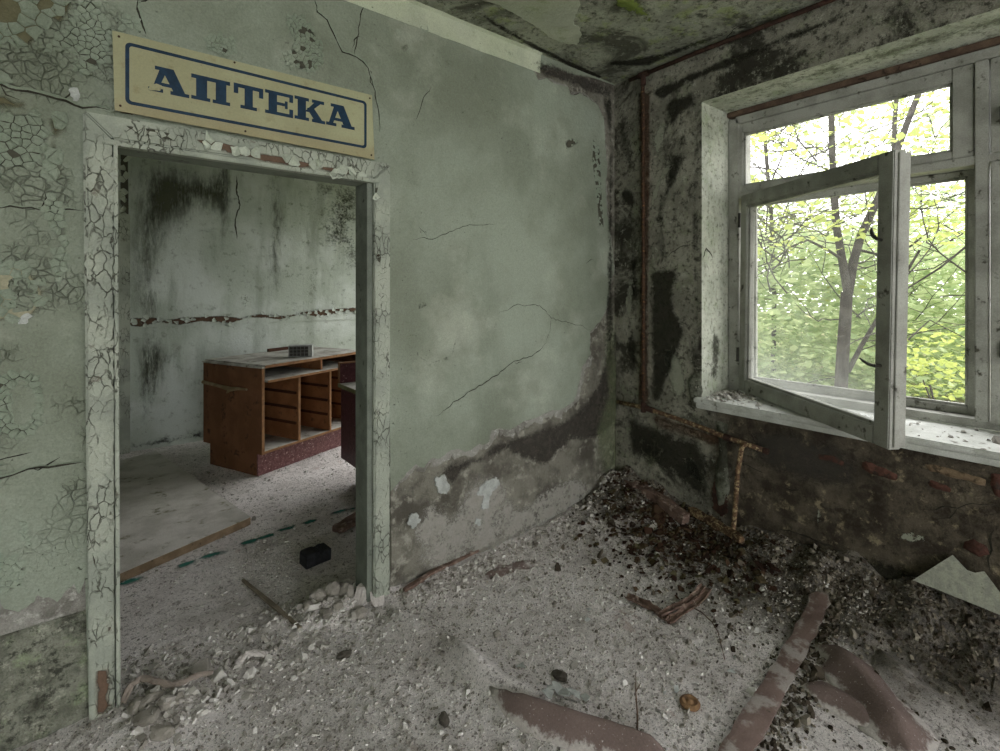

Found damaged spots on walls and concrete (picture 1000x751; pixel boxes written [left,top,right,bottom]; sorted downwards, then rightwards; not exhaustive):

peeling [0,0,142,76]
crack [315,0,381,131]
peeling [120,124,367,179]
water stain [144,172,224,262]
rust [639,93,650,401]
peeling [130,307,356,328]
spalling [372,70,615,598]
crack [437,304,588,416]
water stain [651,270,686,400]
water stain [711,334,719,376]
peeling [0,138,132,751]
water stain [629,420,707,501]